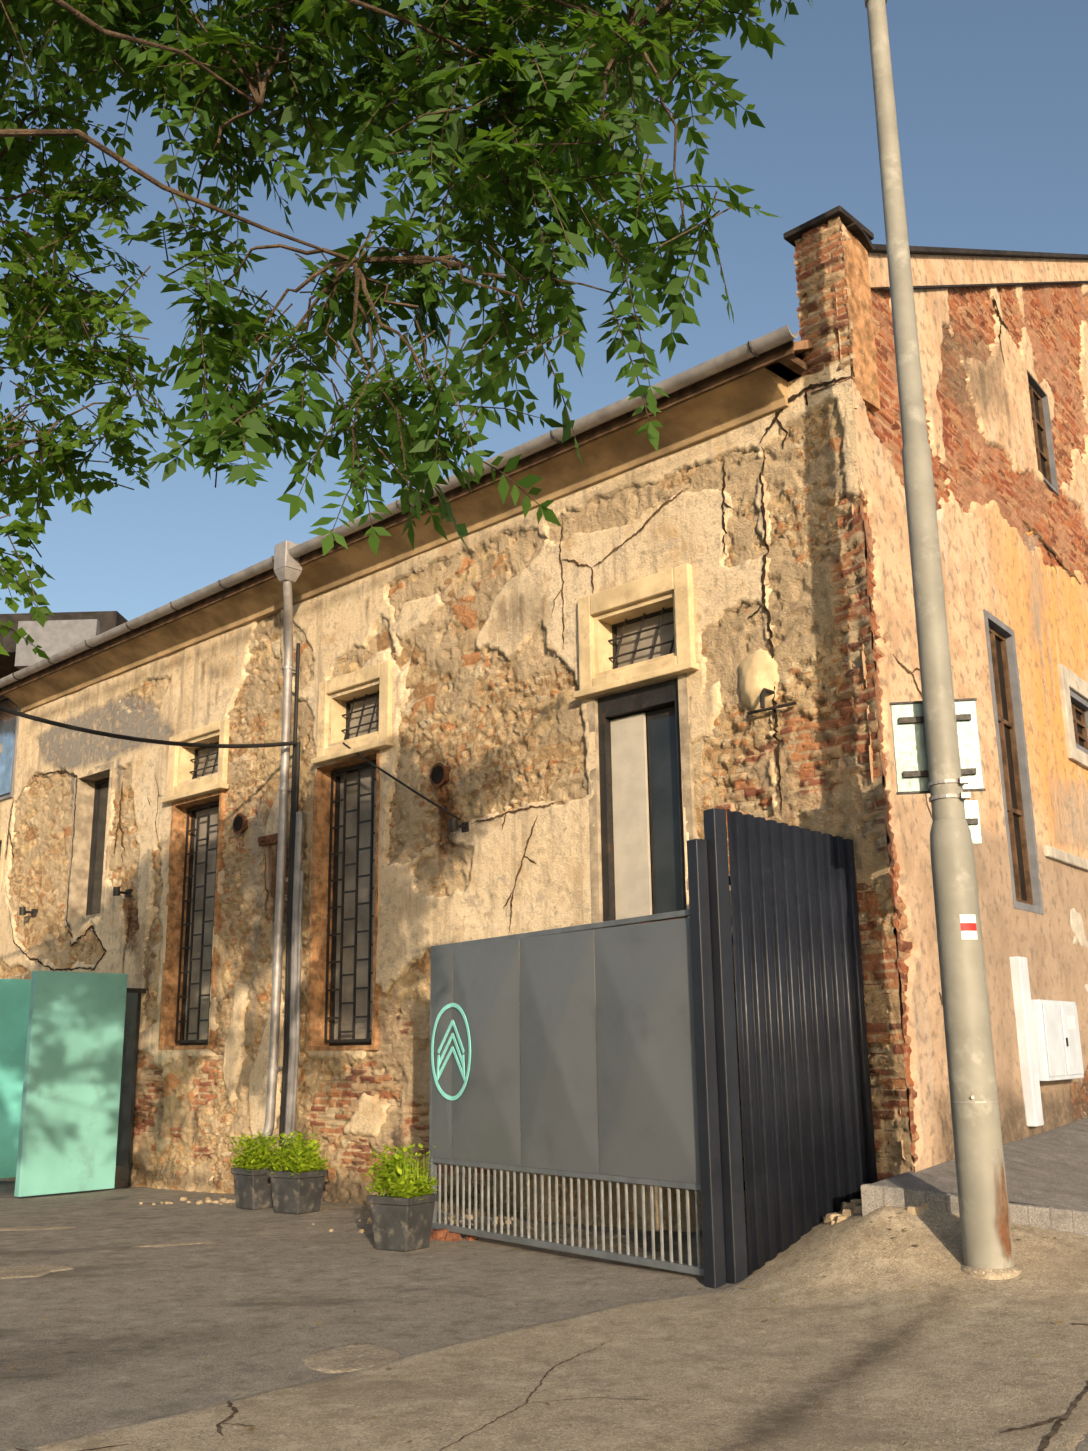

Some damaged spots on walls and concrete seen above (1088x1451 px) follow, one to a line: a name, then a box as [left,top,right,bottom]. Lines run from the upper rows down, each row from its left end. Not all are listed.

spalling [924,283,1088,584]
crack [551,376,851,815]
spalling [0,769,105,980]
spalling [108,764,163,1032]
crack [468,801,563,932]
spalling [123,234,920,1232]
peeling [1070,908,1088,947]
spalling [1070,1069,1088,1119]